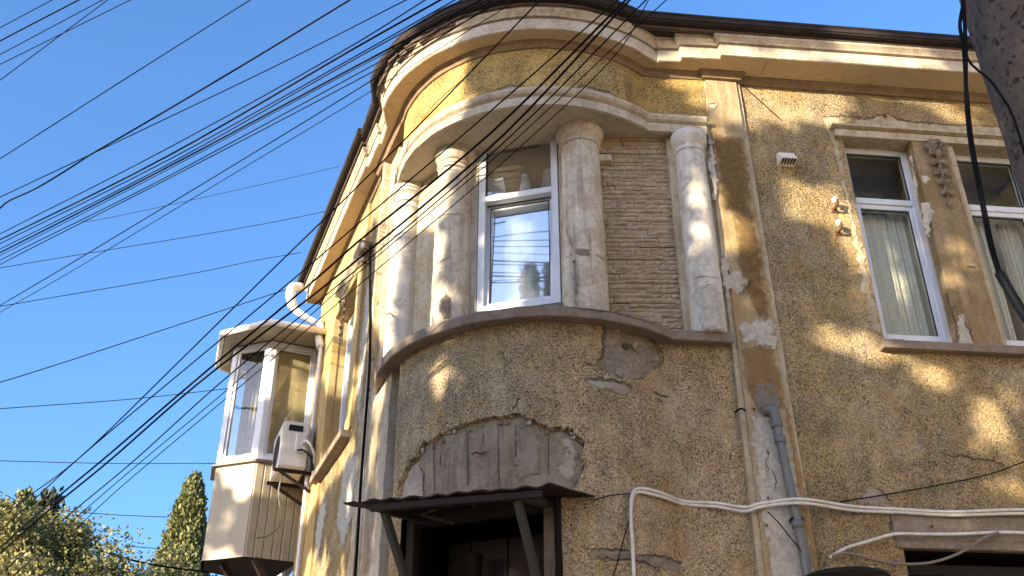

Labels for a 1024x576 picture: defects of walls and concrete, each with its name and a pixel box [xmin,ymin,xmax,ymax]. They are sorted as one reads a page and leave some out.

flaking render [708,140,719,201]
flaking render [823,113,1001,335]
flaking render [432,294,452,325]
flaking render [583,327,664,395]
flaking render [696,251,778,350]
flaking render [957,314,973,343]
flaking render [402,395,585,498]
flaking render [748,382,814,576]
flaking render [583,547,682,572]